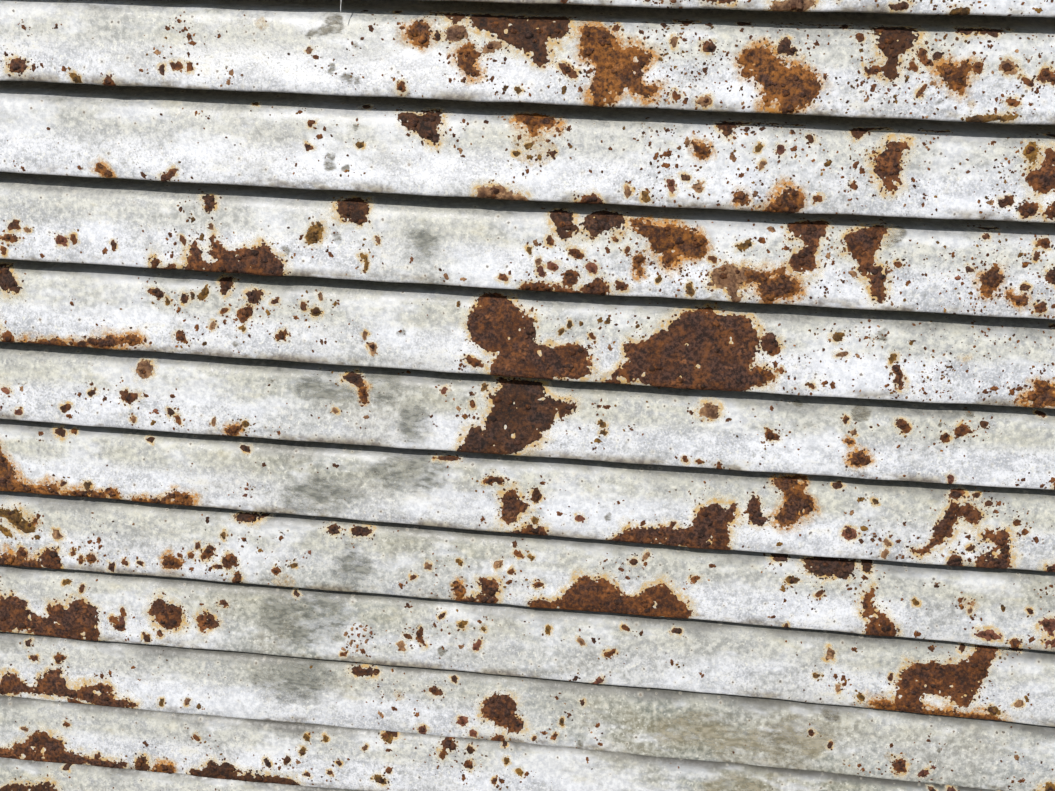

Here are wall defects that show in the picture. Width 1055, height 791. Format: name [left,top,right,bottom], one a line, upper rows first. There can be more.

corrosion [303,46,364,89]
corrosion [71,161,117,178]
corrosion [49,229,82,253]
corrosion [311,369,380,429]
corrosion [330,0,1055,791]
corrosion [209,414,269,471]
corrosion [318,522,377,548]
corrosion [0,435,311,709]